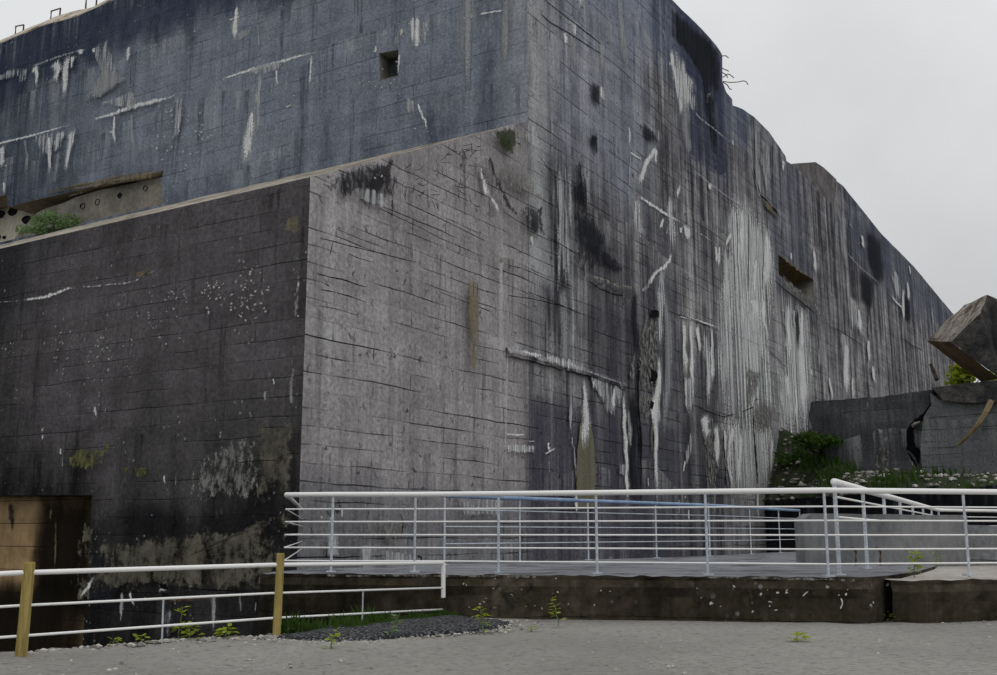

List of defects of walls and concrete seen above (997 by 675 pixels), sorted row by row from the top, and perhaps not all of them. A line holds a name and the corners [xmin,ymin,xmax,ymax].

water stain [0,127,74,172]
water stain [0,49,83,109]
water stain [96,73,182,146]
water stain [327,158,397,216]
water stain [629,157,677,227]
water stain [663,10,720,152]
water stain [510,156,632,511]
water stain [650,196,821,515]
water stain [841,231,911,397]
peeling [191,418,292,499]
water stain [0,497,92,652]
peeling [77,515,290,621]